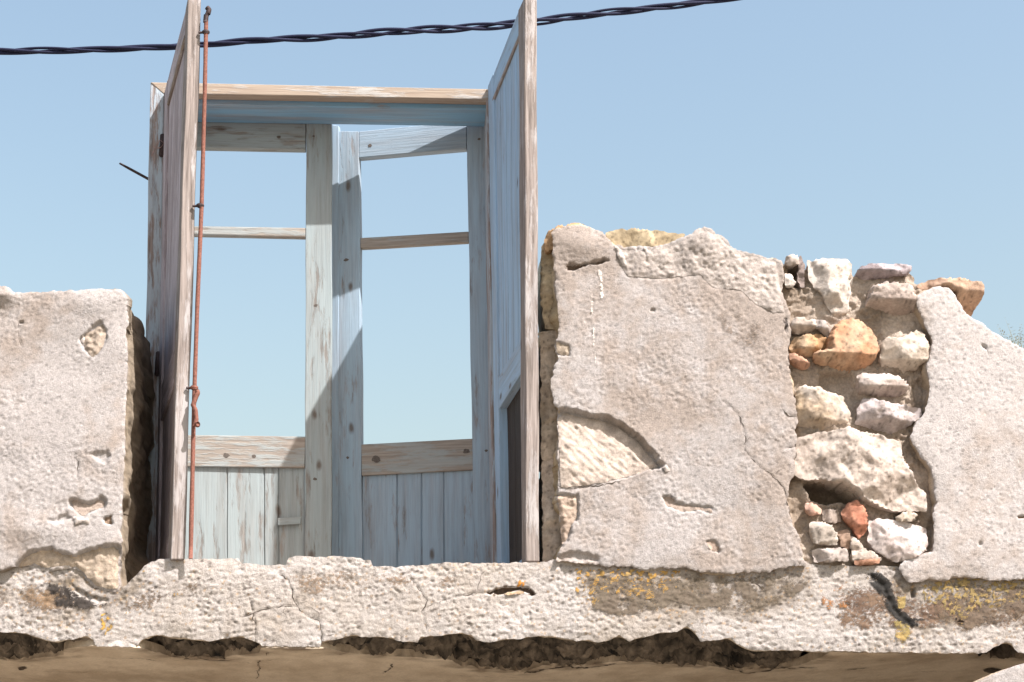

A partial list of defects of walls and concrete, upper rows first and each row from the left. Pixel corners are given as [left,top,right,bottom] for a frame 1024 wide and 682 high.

flaking render [81,324,106,357]
flaking render [558,413,670,544]
flaking render [72,500,112,524]
flaking render [663,497,712,513]
flaking render [19,547,120,589]
crack [242,575,347,678]
hole [487,585,535,596]
leakage [865,572,1024,643]